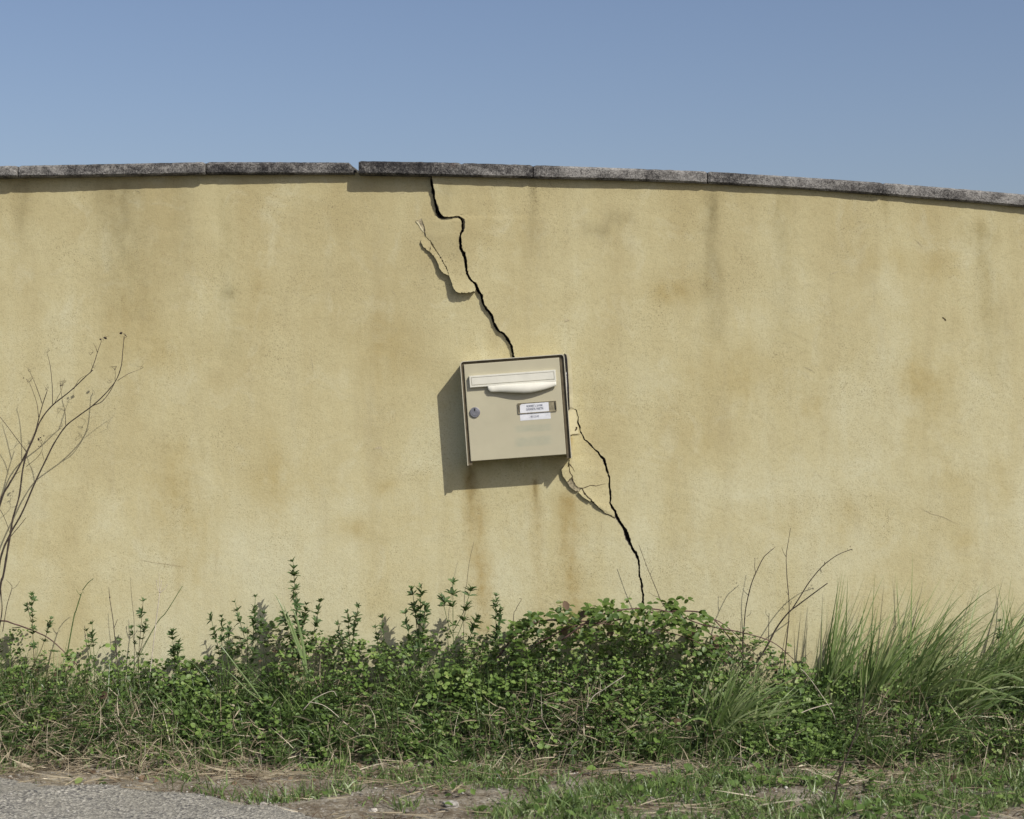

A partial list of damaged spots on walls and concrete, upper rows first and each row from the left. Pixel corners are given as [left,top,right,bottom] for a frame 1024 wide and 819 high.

peeling [416,215,476,294]
crack [430,178,515,357]
peeling [561,454,615,517]
crack [570,409,647,681]